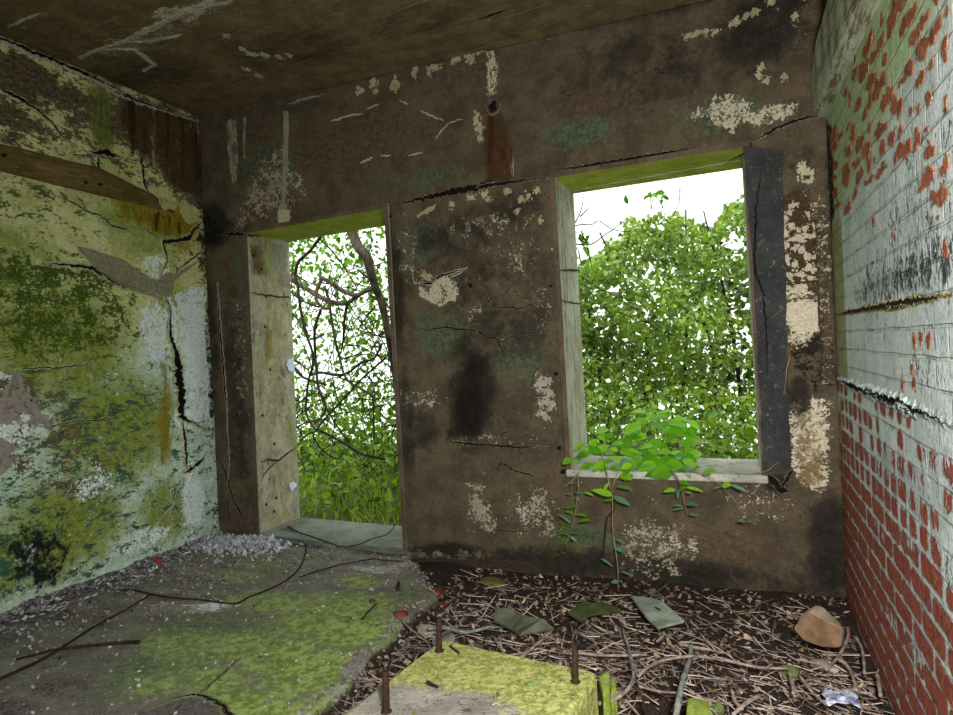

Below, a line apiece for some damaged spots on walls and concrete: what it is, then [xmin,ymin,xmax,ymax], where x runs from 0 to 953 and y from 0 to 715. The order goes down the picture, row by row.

water stain [78,0,234,72]
water stain [486,51,499,95]
rust [486,111,514,180]
peeling [708,93,798,130]
peeling [825,0,949,220]
crack [0,86,260,528]
water stain [136,283,211,420]
crack [749,114,819,380]
peeling [783,161,830,295]
crack [835,290,952,317]
crack [837,375,953,431]
peeling [837,380,953,715]